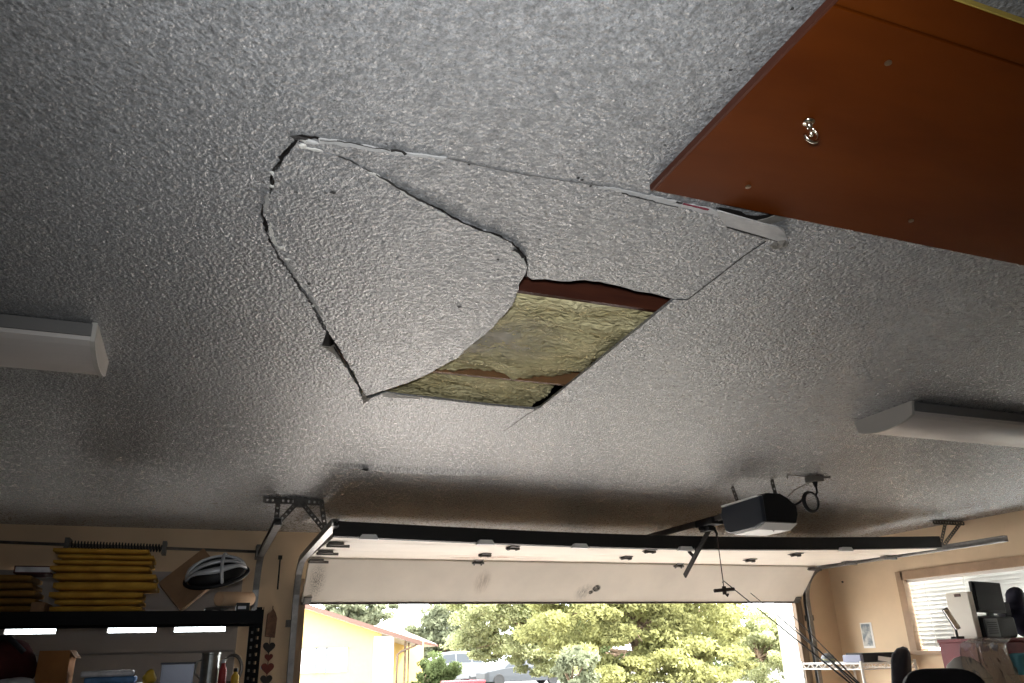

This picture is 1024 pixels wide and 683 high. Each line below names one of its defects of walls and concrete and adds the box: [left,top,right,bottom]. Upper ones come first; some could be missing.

crack [447,158,604,187]
crack [261,135,528,395]
crack [676,241,766,300]